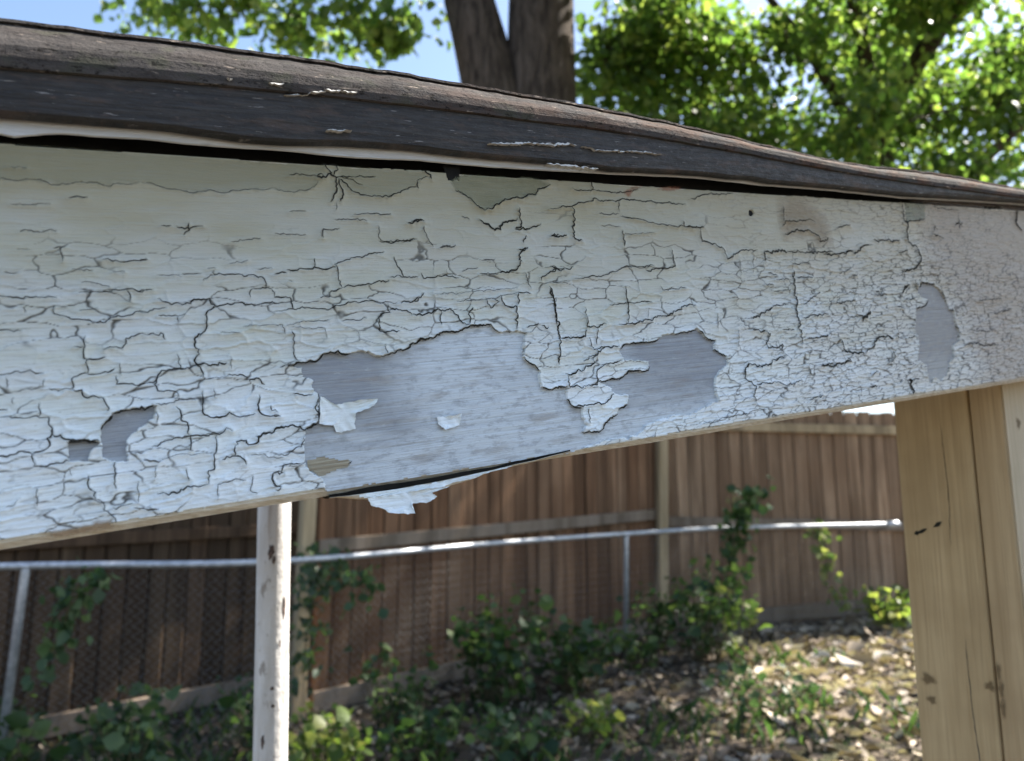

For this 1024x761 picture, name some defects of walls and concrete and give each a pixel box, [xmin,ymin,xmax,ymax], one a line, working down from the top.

crack [985,206,1023,231]
crack [0,162,962,522]
peeling [914,282,959,383]
crack [966,298,1012,346]
peeling [68,405,155,462]
peeling [289,324,726,514]